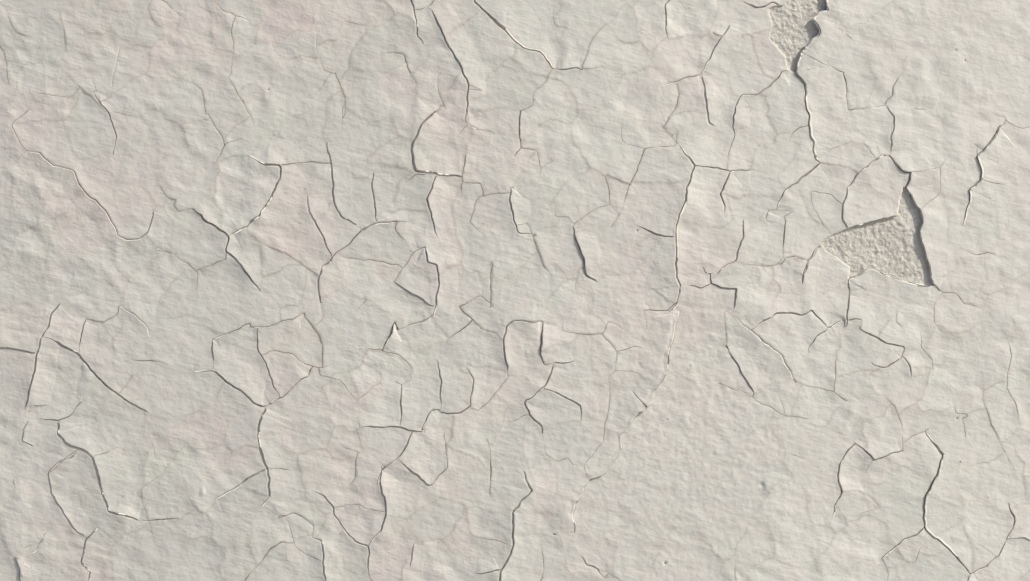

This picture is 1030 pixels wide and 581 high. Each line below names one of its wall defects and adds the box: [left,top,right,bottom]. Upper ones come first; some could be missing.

crack [388,0,488,123]
peeling [743,0,873,163]
crack [716,64,946,278]
crack [0,2,508,485]
peeling [638,134,956,355]
peeling [503,321,599,433]
crack [719,316,847,419]
crack [829,286,974,378]
crack [15,450,110,581]
peeling [474,465,562,581]
peeling [833,434,903,520]
peeling [923,417,982,574]